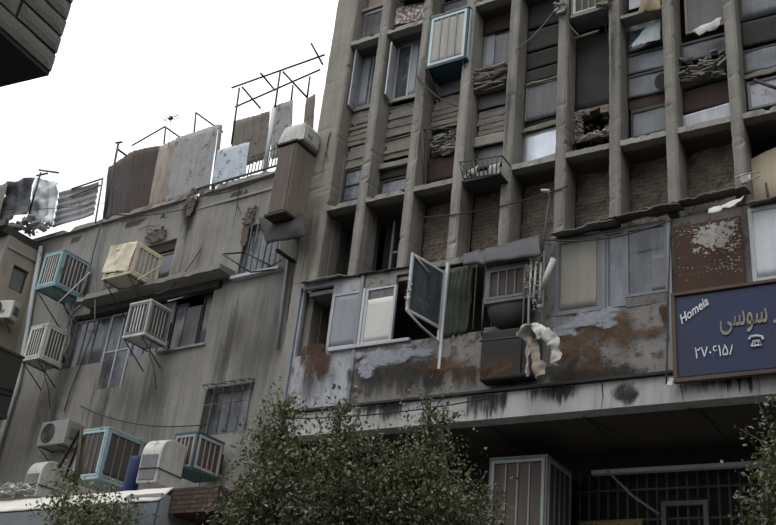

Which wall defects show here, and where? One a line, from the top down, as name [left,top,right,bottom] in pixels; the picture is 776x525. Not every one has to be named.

peeling [676,217,742,281]
rust [297,343,331,386]
peeling [354,340,433,378]
rust [418,357,513,392]
damp [466,392,507,415]
damp [531,363,643,404]